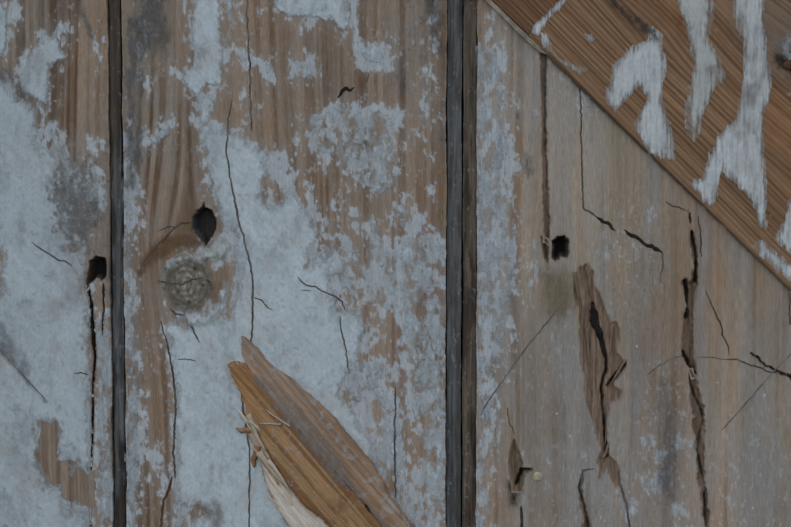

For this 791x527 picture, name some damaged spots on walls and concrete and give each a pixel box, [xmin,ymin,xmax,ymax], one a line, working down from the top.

peeling [0,31,111,527]
crack [75,283,105,471]
crack [225,0,272,343]
peeling [167,0,407,527]
crack [590,303,607,360]
crack [579,88,664,283]
peeling [608,26,673,159]
peeling [678,0,725,141]
crack [666,202,791,527]
peeling [693,0,772,227]
peeling [759,203,791,281]
crack [577,468,594,527]